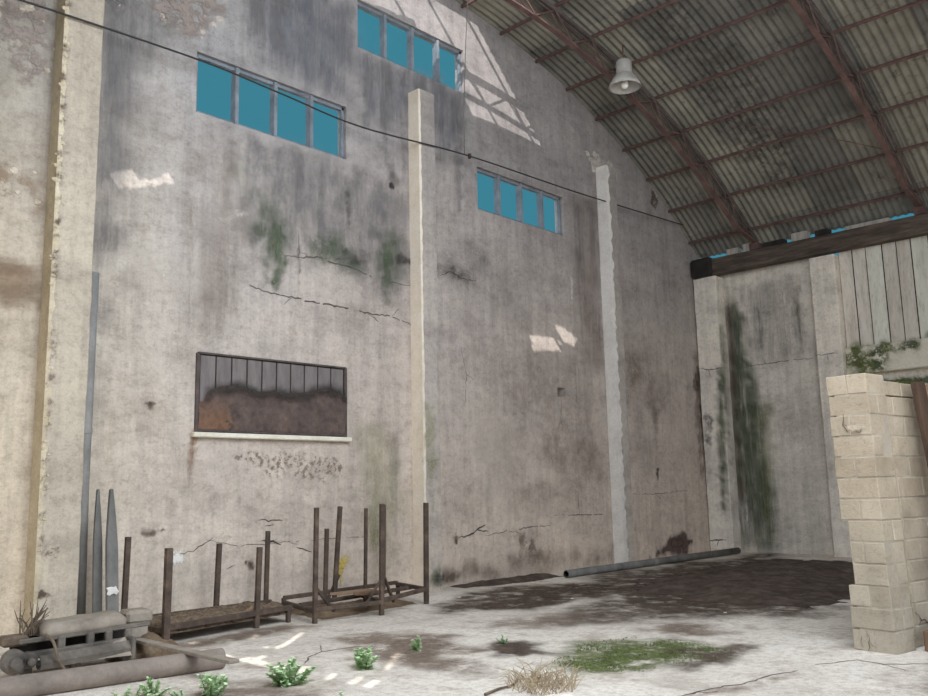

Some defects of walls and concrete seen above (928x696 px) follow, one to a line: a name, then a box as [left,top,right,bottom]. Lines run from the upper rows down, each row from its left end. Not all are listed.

water stain [257,227,287,289]
crack [284,234,410,286]
water stain [0,263,34,302]
crack [250,285,411,325]
spalling [234,452,343,482]
water stain [440,307,815,623]
crack [459,500,602,538]
crack [180,519,352,569]
water stain [432,570,455,582]